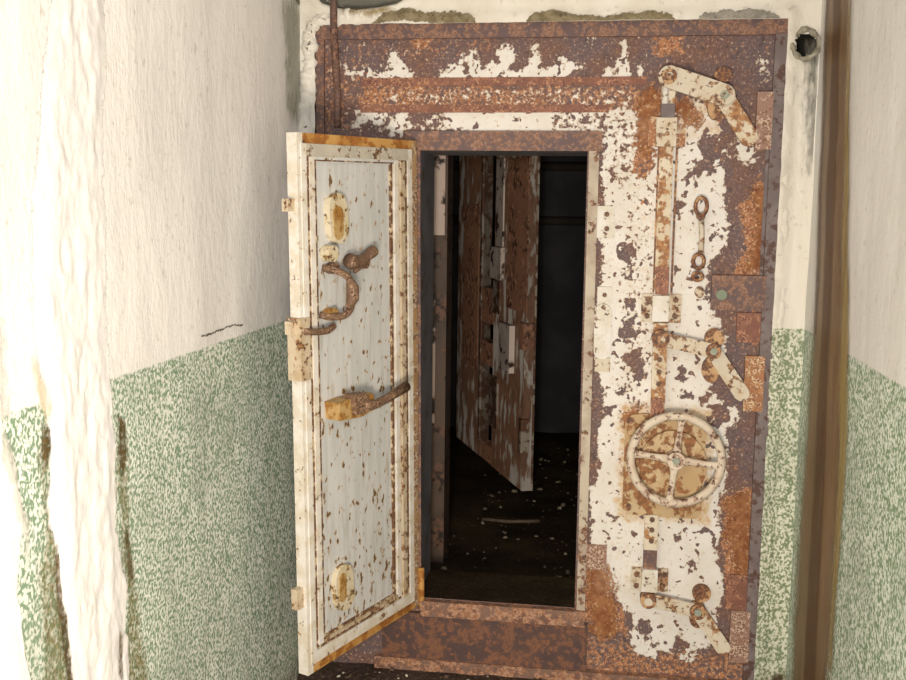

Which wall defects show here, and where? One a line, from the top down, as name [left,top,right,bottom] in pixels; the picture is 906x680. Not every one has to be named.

spalling [526,9,674,22]
rust [630,81,661,161]
rust [675,98,705,133]
rust [742,184,764,273]
rust [617,401,649,428]
rust [720,489,752,575]
rust [585,564,620,642]